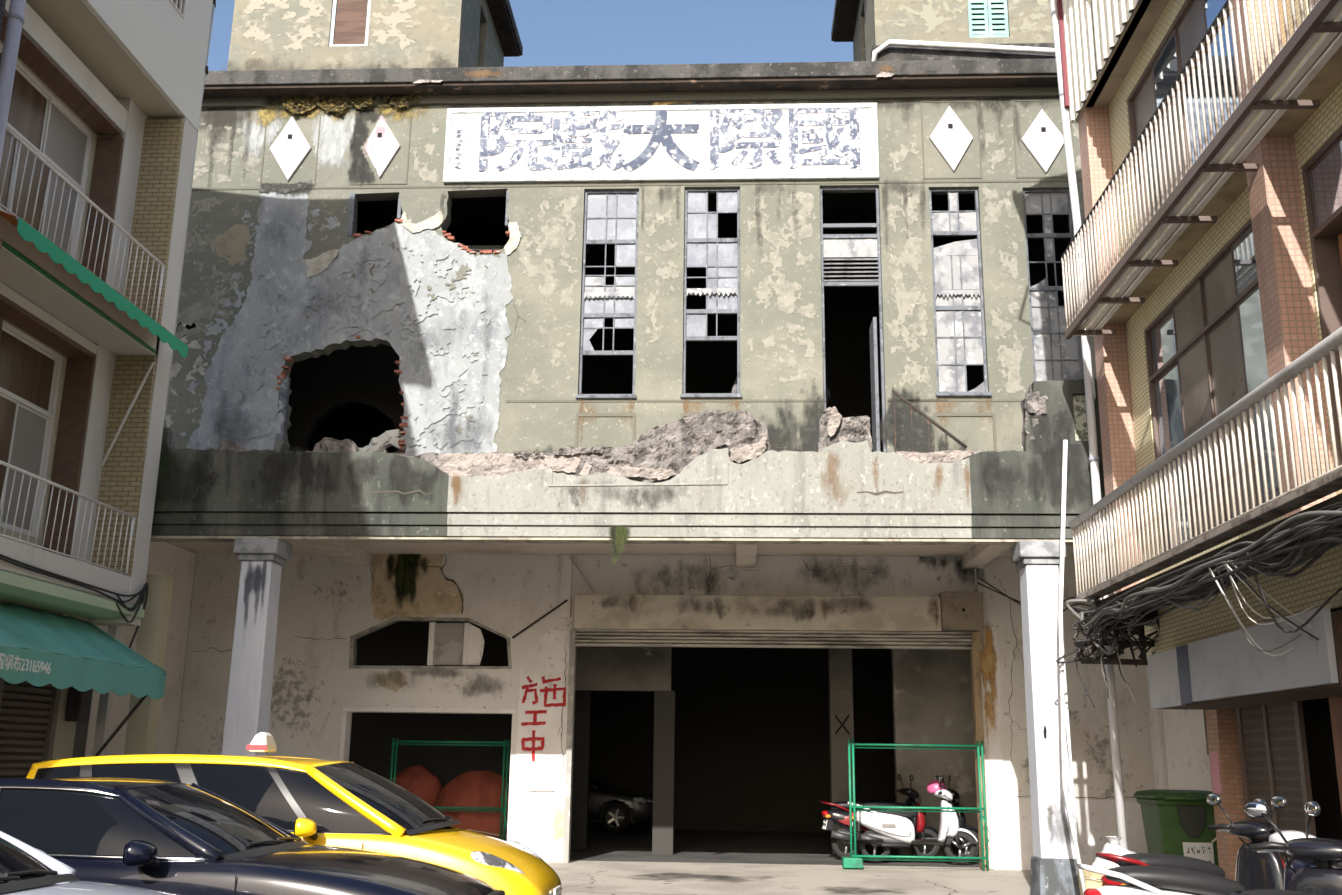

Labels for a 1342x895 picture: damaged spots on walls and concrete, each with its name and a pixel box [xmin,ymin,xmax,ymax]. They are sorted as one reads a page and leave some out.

flaking render [166,122,767,482]
spalling [819,406,872,451]
water stain [156,452,217,502]
water stain [390,455,436,502]
water stain [243,560,267,620]
water stain [387,554,427,603]
flaking render [370,554,465,620]